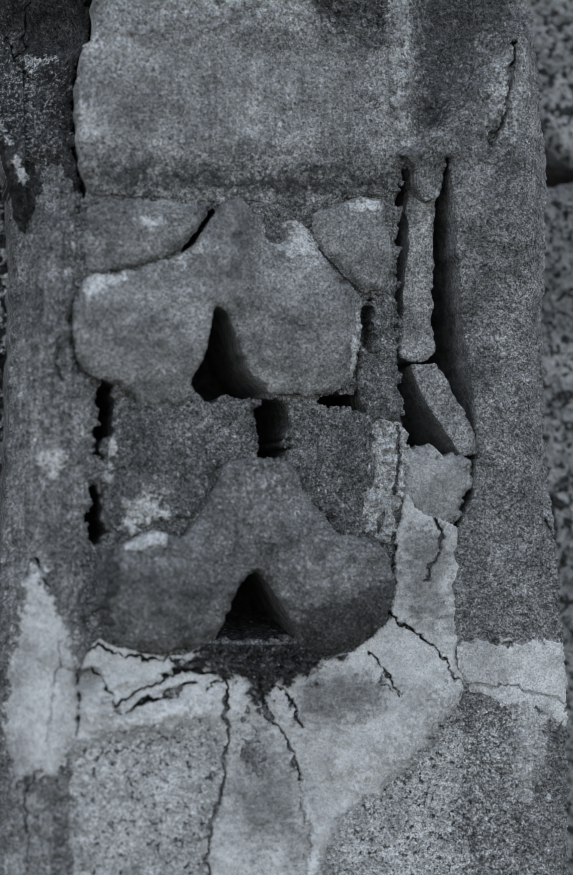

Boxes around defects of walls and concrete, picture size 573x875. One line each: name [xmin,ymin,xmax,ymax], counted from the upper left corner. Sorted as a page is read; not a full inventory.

crack [423,517,444,581]
crack [388,544,469,686]
water stain [80,695,216,733]
crack [86,642,230,804]
crack [261,683,303,750]
water stain [214,520,462,875]
crack [368,651,399,693]
water stain [505,699,558,805]